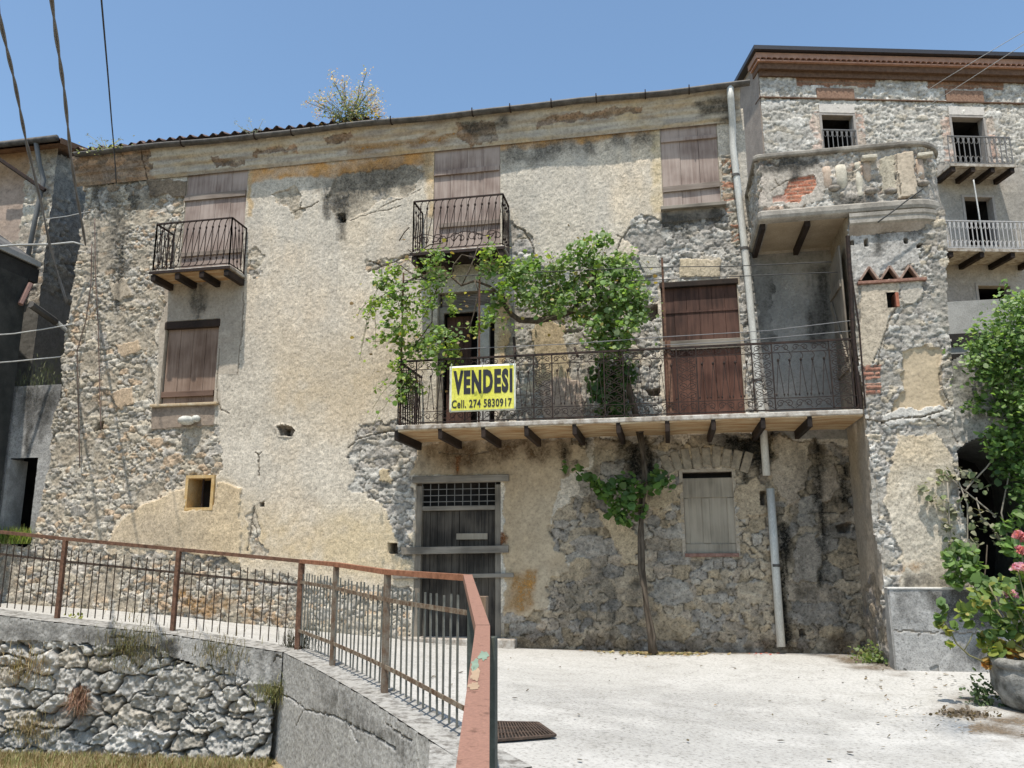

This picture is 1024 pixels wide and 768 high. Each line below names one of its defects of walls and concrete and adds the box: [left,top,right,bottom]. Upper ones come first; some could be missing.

damp [324,167,402,238]
crack [350,188,422,221]
flaking render [773,174,817,203]
flaking render [0,141,425,639]
spalling [498,155,768,422]
peeling [860,281,924,395]
peeling [883,405,952,427]
flaking render [501,431,890,667]
damp [778,516,808,653]
damp [814,442,825,550]